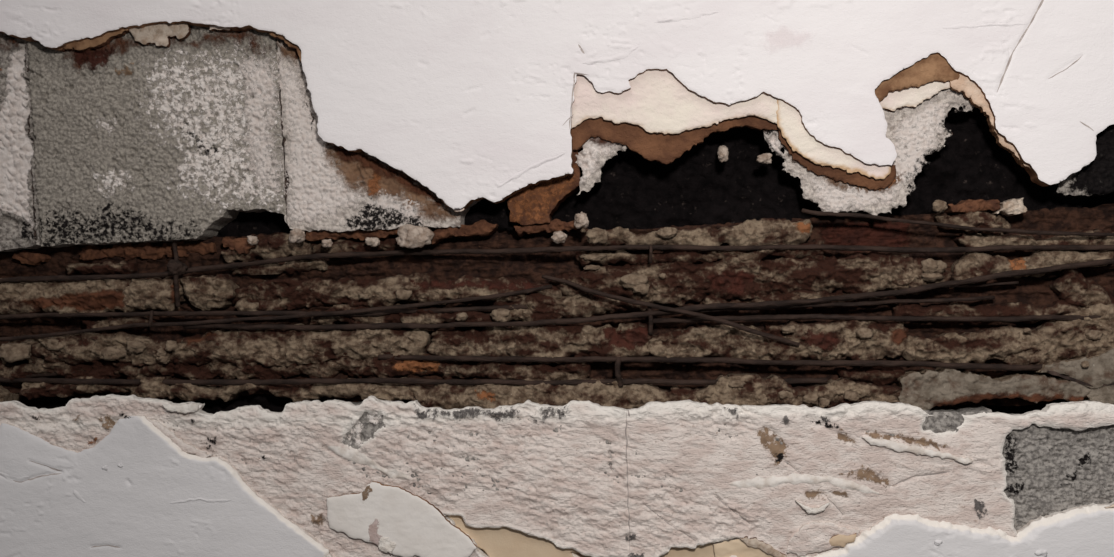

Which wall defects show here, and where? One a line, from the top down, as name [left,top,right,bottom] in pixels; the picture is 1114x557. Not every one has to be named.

peeling [56,23,191,52]
peeling [269,32,302,63]
peeling [571,69,896,191]
peeling [875,54,1030,169]
spalling [0,211,1114,458]
peeling [862,436,973,464]
peeling [326,481,477,557]
peeling [713,500,859,557]